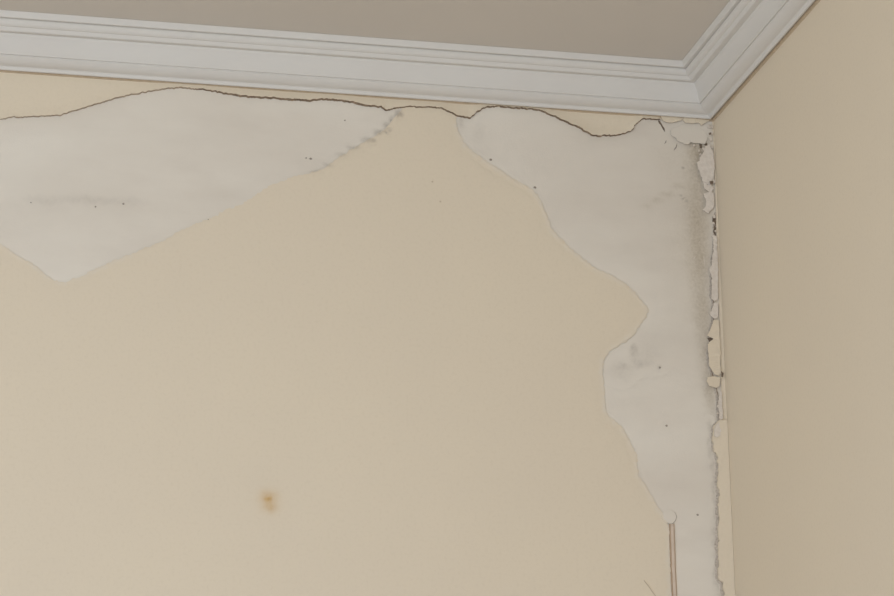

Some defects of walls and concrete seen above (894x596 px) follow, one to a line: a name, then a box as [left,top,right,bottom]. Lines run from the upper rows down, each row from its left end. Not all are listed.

peeling [0,80,735,596]
damp [602,120,721,427]